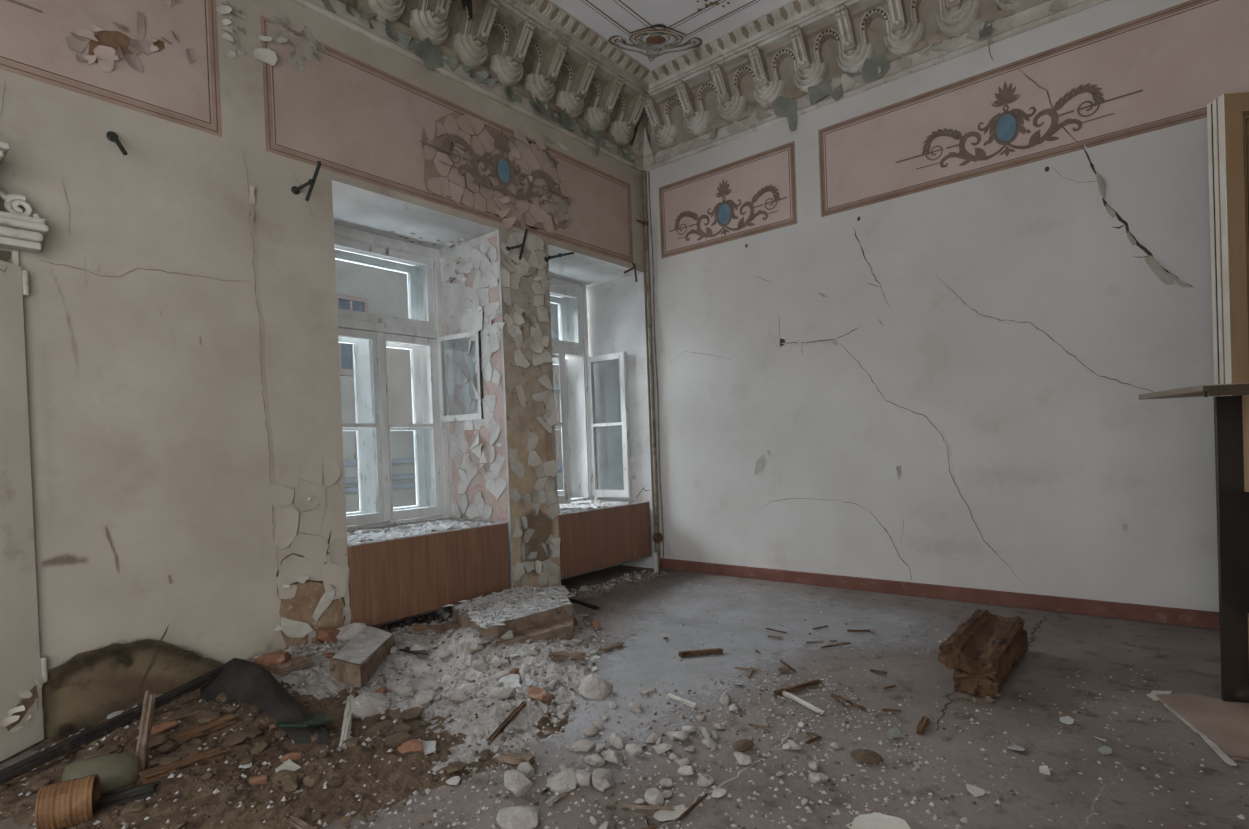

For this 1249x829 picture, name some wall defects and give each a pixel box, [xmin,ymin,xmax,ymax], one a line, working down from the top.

peeling [70,11,179,72]
peeling [309,0,420,56]
peeling [793,0,1087,110]
crack [1022,72,1198,287]
crack [851,227,888,304]
crack [37,147,347,598]
peeling [390,111,575,629]
crack [933,277,1168,400]
crack [766,317,1027,585]
peeling [269,454,351,648]
peeling [1,674,47,733]